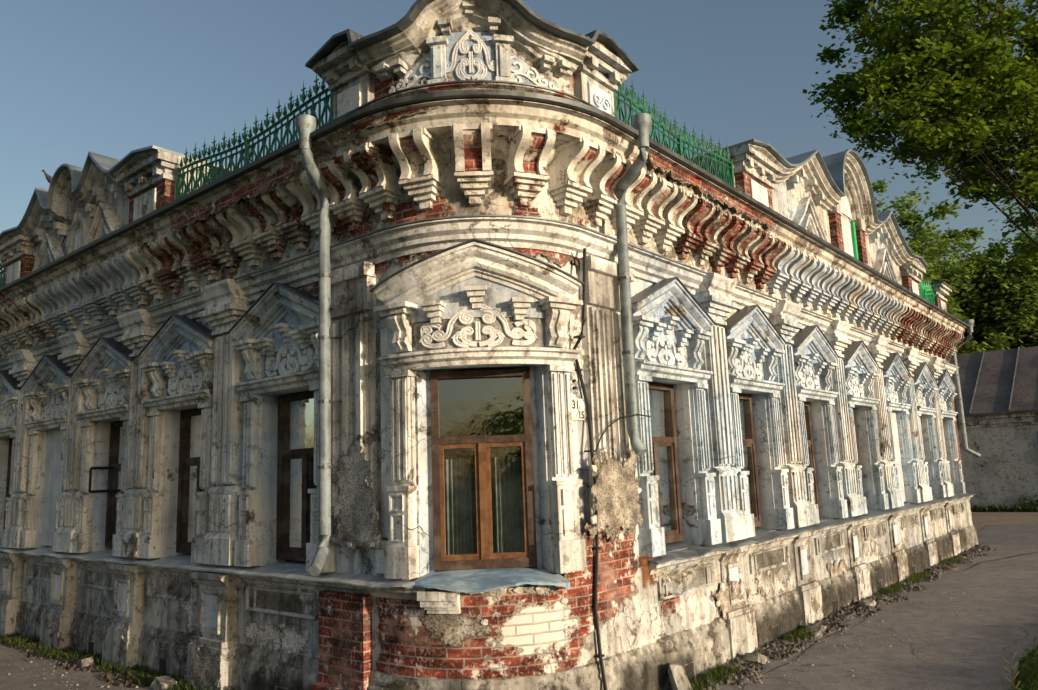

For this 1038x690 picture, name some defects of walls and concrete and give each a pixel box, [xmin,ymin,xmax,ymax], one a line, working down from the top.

flaking render [331,195,458,242]
flaking render [513,205,542,217]
flaking render [649,152,773,230]
flaking render [374,250,441,282]
flaking render [506,247,581,272]
flaking render [330,326,388,554]
flaking render [375,447,704,681]
leakage [870,528,967,593]
leakage [821,579,858,615]
peeling [243,588,319,657]
leakage [756,600,805,647]
leakage [623,655,694,690]